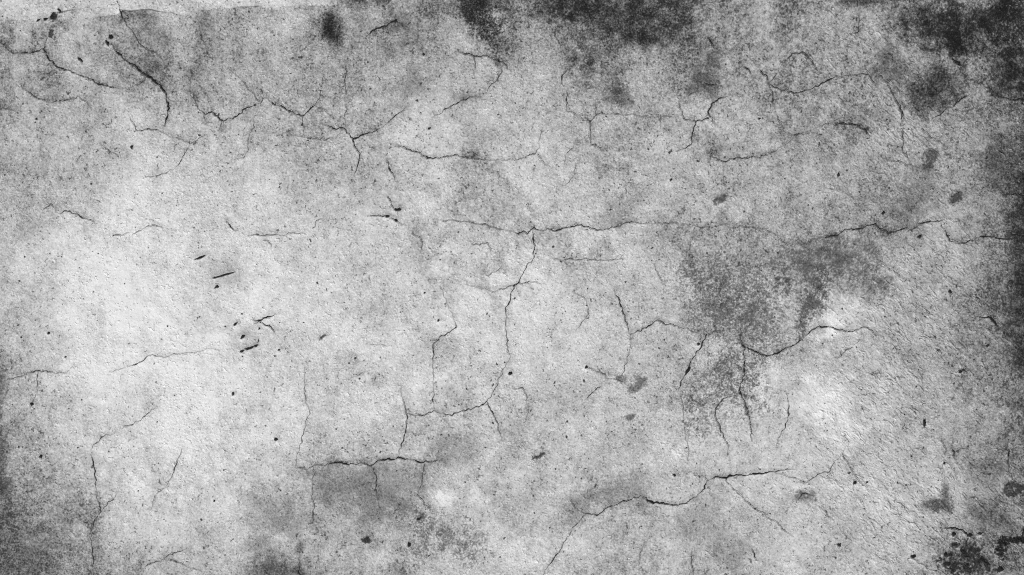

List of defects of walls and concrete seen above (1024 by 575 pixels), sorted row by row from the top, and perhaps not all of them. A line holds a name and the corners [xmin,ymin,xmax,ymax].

crack [114,2,403,177]
crack [296,26,1024,526]
crack [543,289,874,575]